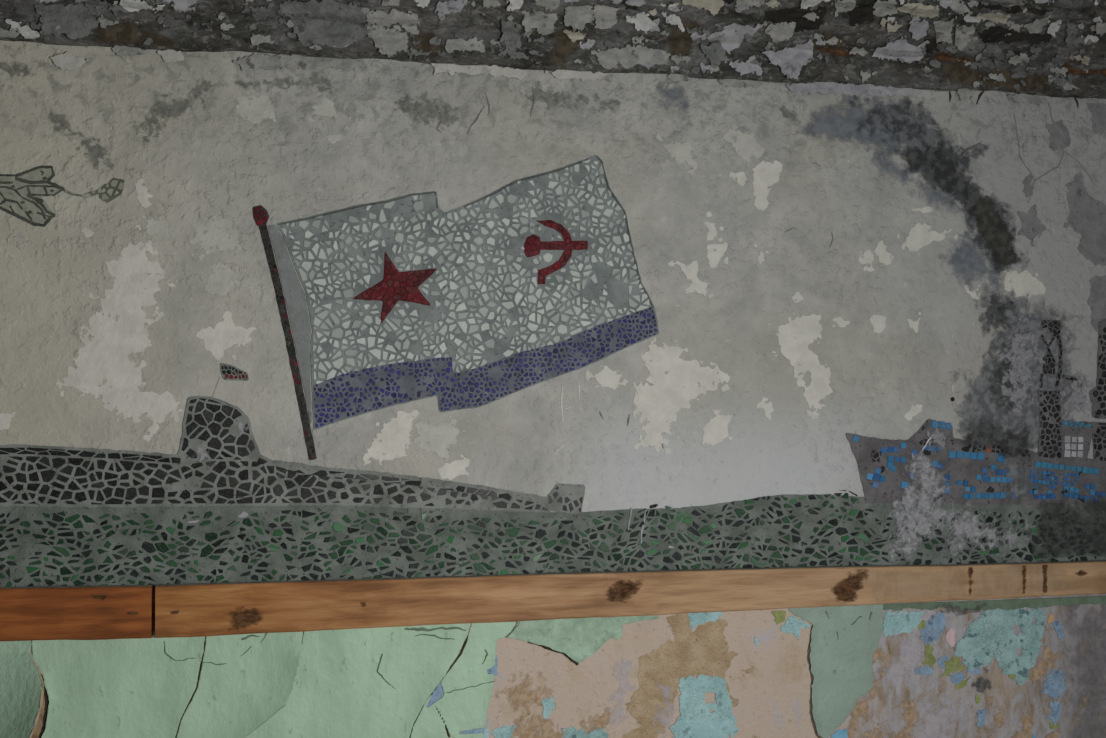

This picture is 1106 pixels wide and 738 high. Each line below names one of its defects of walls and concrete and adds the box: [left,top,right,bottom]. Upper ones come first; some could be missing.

peeling [0,0,1106,104]
peeling [720,124,783,211]
peeling [668,211,728,298]
peeling [858,206,958,272]
peeling [964,268,1046,300]
peeling [584,338,732,454]
peeling [769,291,850,419]
crack [39,677,49,738]
crack [164,633,268,738]
peeling [31,615,659,738]
crack [377,653,395,689]
peeling [789,596,1106,738]